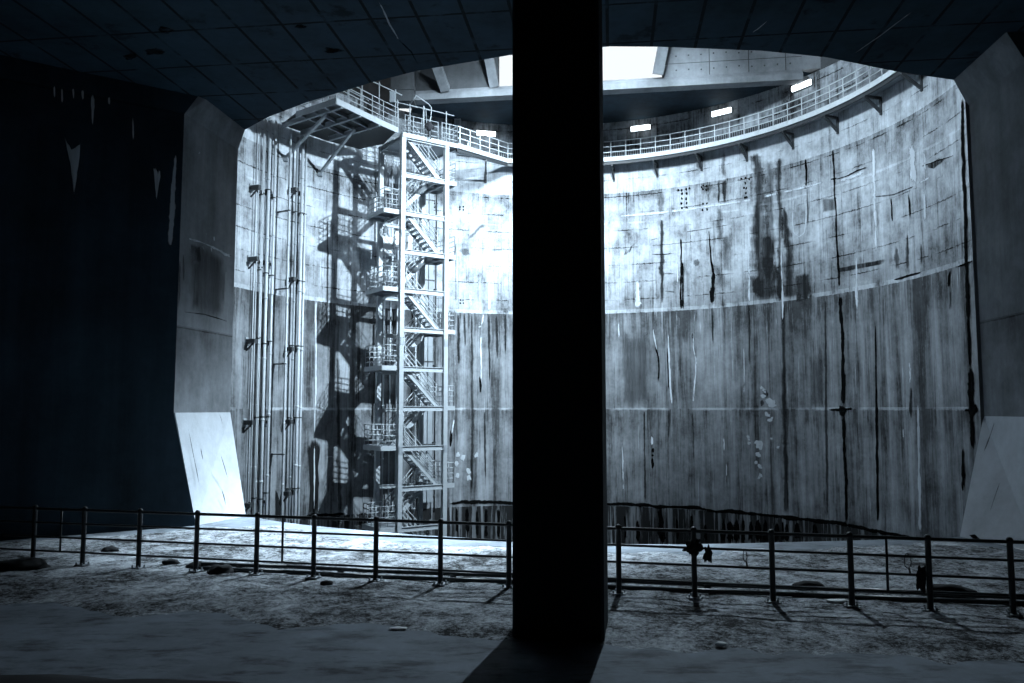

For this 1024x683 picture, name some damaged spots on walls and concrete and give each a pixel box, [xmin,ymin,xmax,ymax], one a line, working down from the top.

peeling [454,452,479,481]
peeling [746,435,779,479]
damp [607,149,922,543]
peeling [760,386,777,422]
crack [803,150,866,525]
crack [876,99,994,449]